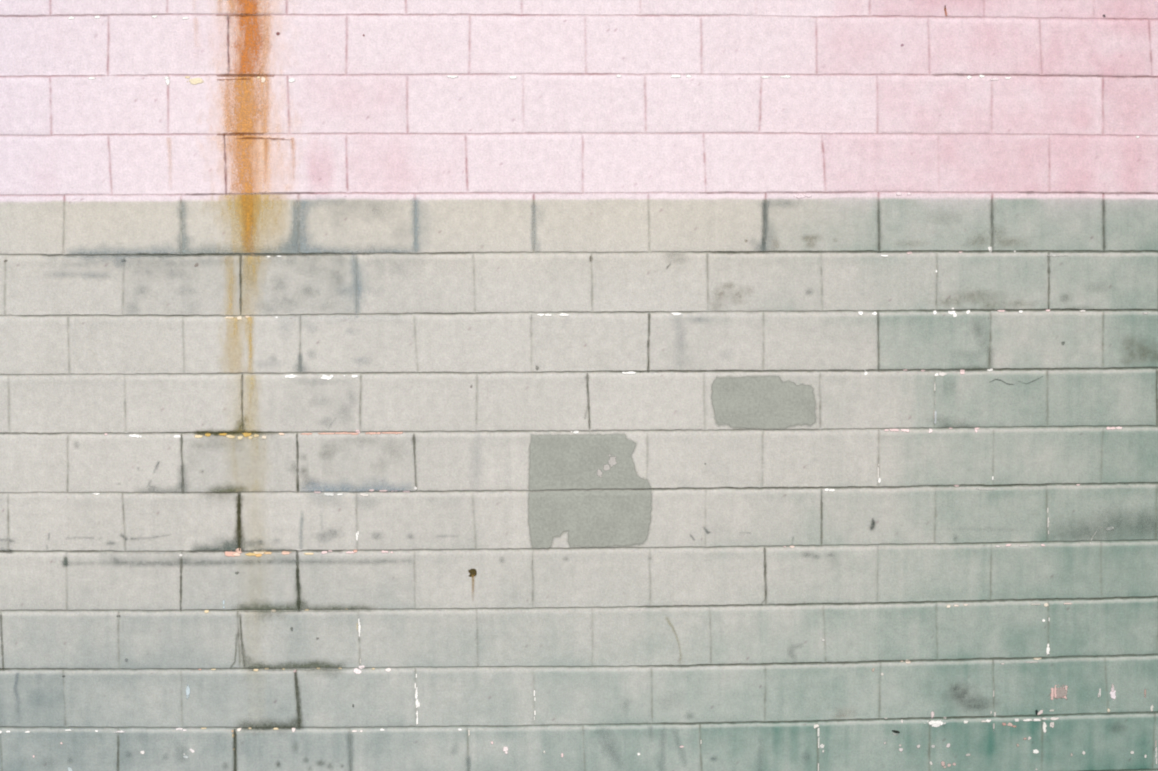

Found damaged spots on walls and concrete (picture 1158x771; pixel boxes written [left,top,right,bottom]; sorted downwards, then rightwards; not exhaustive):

rust [224,0,278,244]